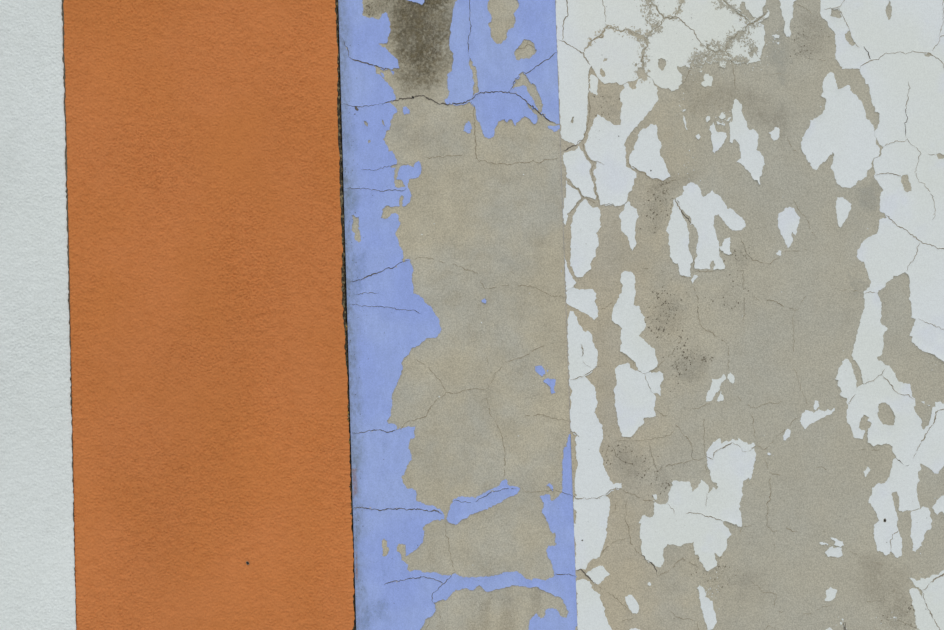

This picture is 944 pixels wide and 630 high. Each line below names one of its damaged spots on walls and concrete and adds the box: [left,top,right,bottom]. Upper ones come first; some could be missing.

damp [366,0,451,85]
crack [793,0,944,70]
crack [341,0,769,214]
crack [627,158,694,226]
crack [876,81,944,271]
peeling [352,215,361,242]
peeling [362,0,944,630]
crack [350,187,816,630]
crack [847,368,915,405]
crack [858,408,944,467]
crack [865,572,944,630]